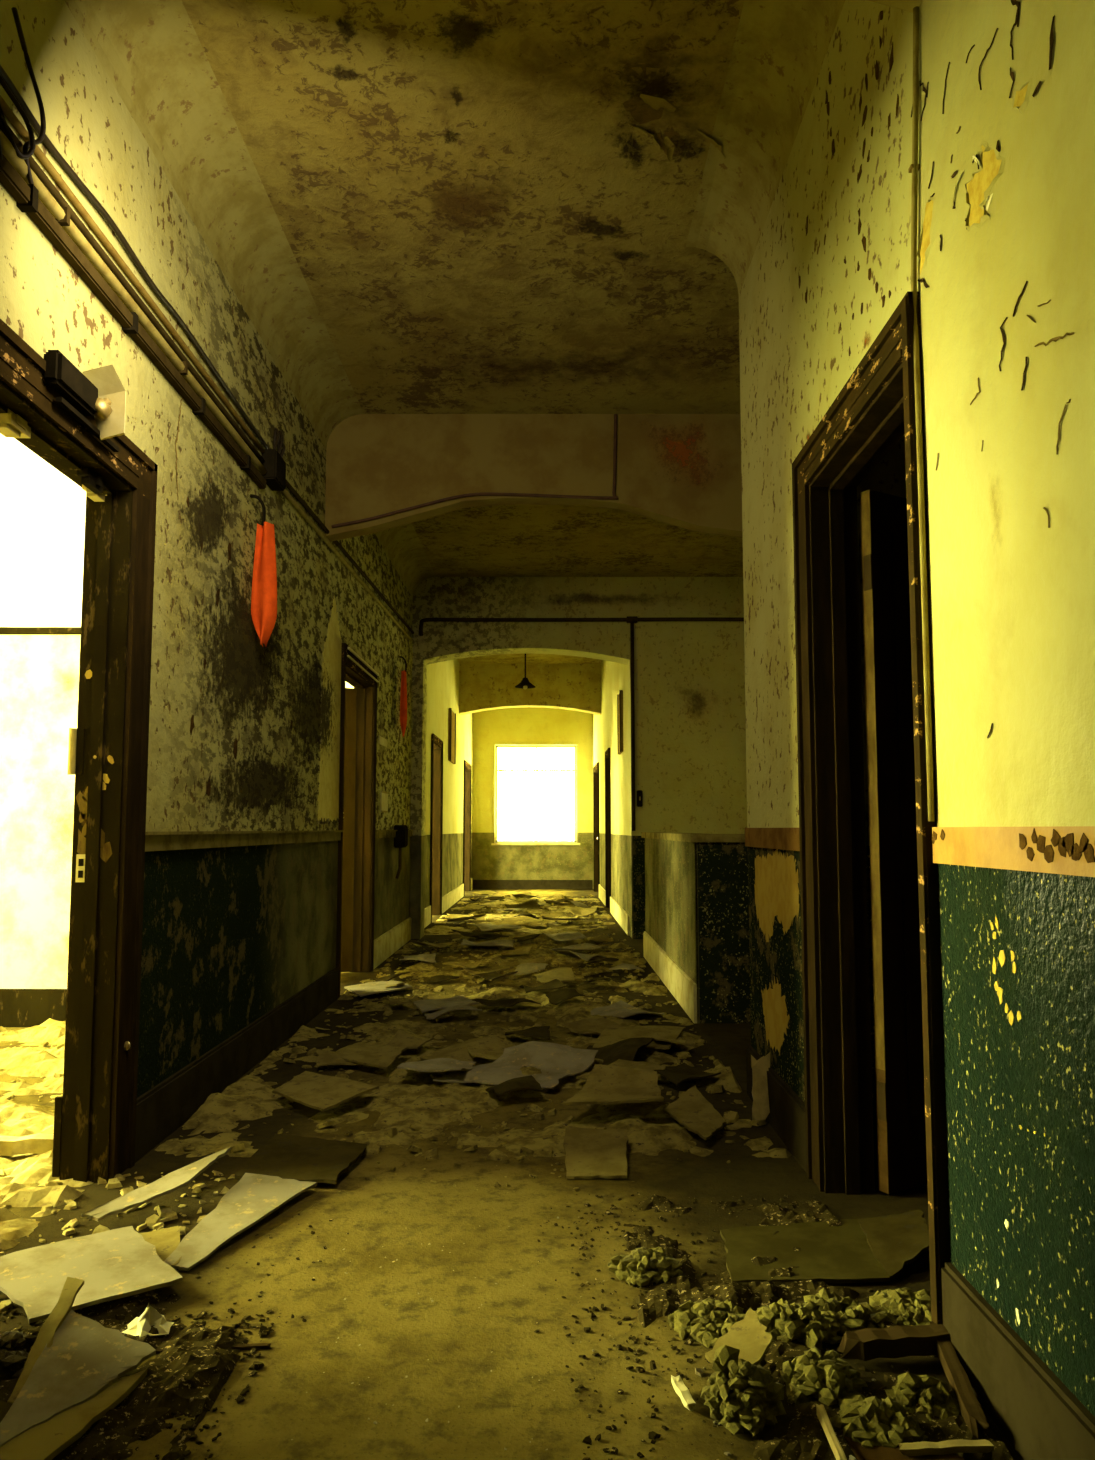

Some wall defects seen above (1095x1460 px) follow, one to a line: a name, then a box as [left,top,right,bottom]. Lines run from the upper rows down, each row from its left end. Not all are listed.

leakage [333,65,359,80]
leakage [440,13,493,53]
leakage [620,47,705,158]
crack [911,0,1055,197]
peeling [951,140,1006,231]
leakage [580,217,645,260]
crack [970,281,1074,405]
crack [1056,399,1071,455]
leakage [175,474,337,818]
peeling [1026,828,1095,863]
peeling [754,849,799,942]
peeling [761,976,790,1055]